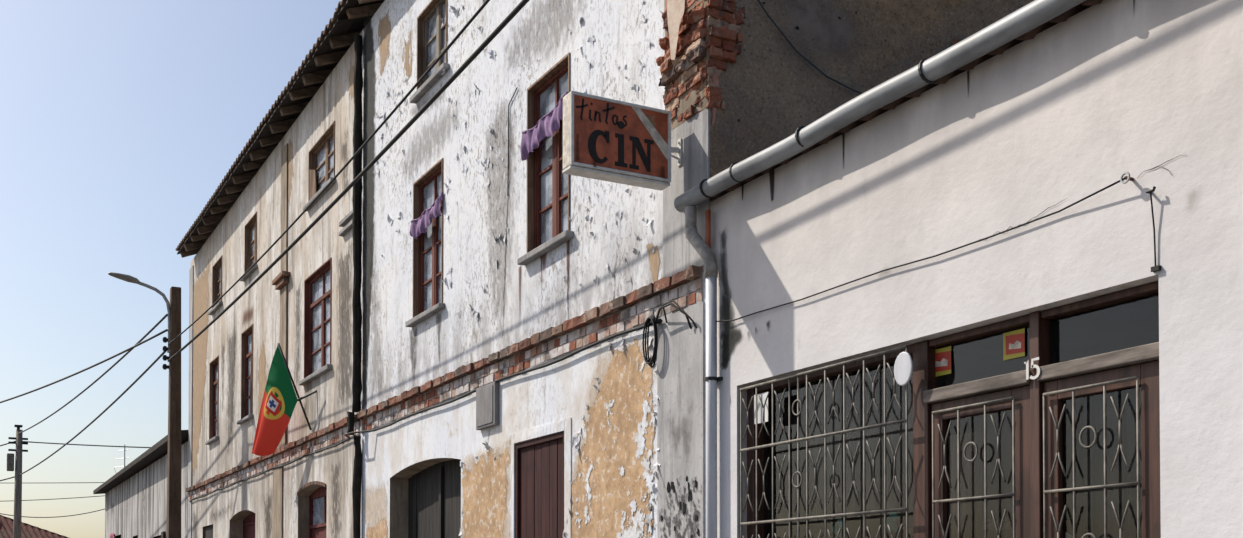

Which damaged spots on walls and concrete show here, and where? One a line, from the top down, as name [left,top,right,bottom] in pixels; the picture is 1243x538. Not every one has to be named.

flaking render [375,9,413,140]
spalling [617,0,746,130]
damp [721,232,769,369]
peeling [365,488,388,538]
flaking render [458,441,510,538]
flaking render [563,336,700,538]